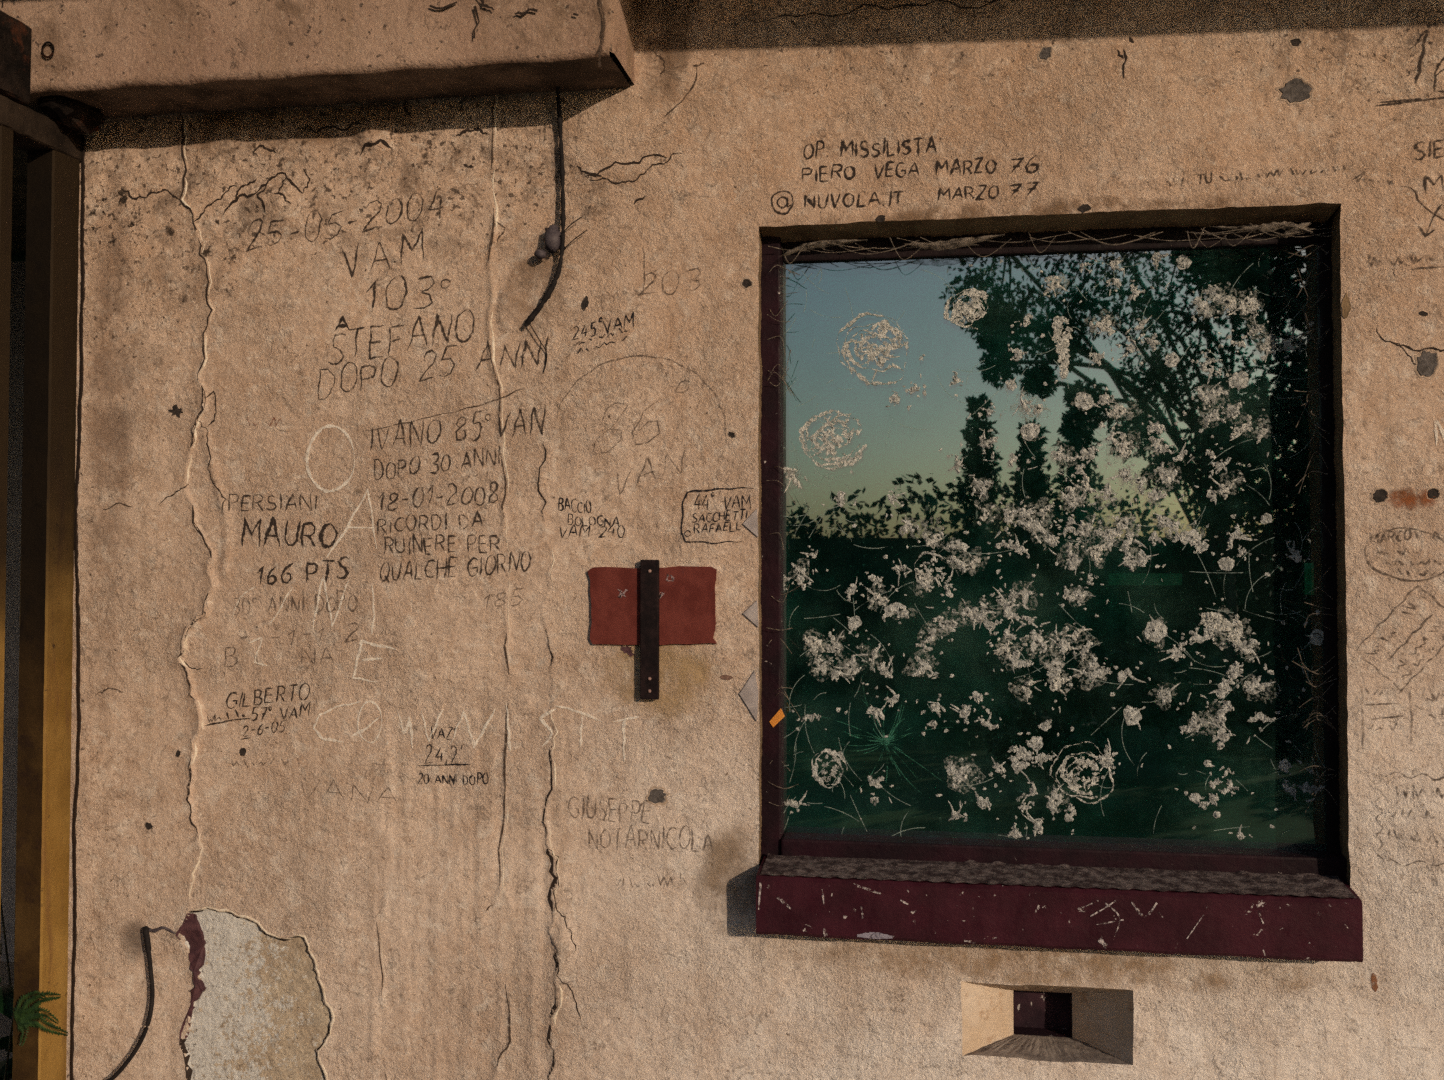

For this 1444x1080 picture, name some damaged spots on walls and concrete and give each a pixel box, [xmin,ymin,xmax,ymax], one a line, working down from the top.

crack [747,0,998,22]
crack [1117,37,1134,77]
crack [456,95,506,261]
crack [1377,331,1444,364]
rust [1392,490,1433,508]
crack [70,113,391,1080]
crack [368,312,555,911]
crack [542,713,581,1080]
spalling [176,906,335,1080]
crack [497,984,511,1066]